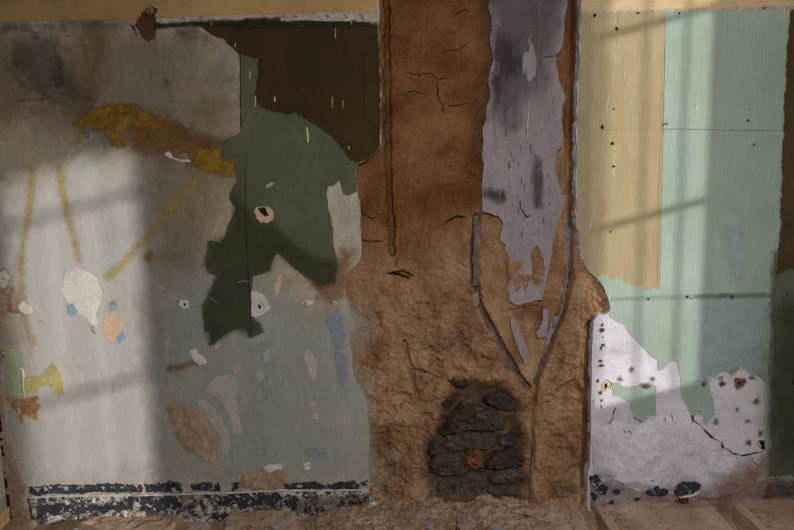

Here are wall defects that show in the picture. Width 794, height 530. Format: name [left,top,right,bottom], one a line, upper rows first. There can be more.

flaking render [131,7,378,47]
flaking render [165,150,191,162]
flaking render [542,195,570,357]
flaking render [471,215,527,389]
flaking render [0,260,369,520]
crack [694,420,763,460]
spalling [678,490,701,504]